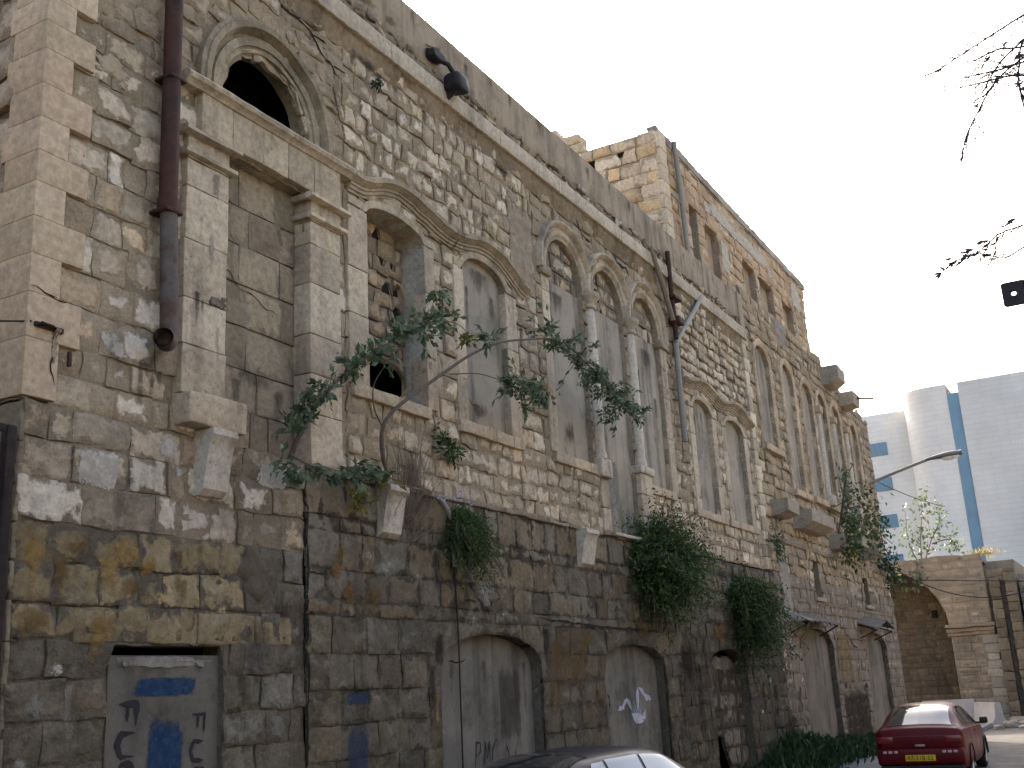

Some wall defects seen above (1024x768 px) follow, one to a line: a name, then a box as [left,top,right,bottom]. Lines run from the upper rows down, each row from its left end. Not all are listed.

crack [279,0,346,77]